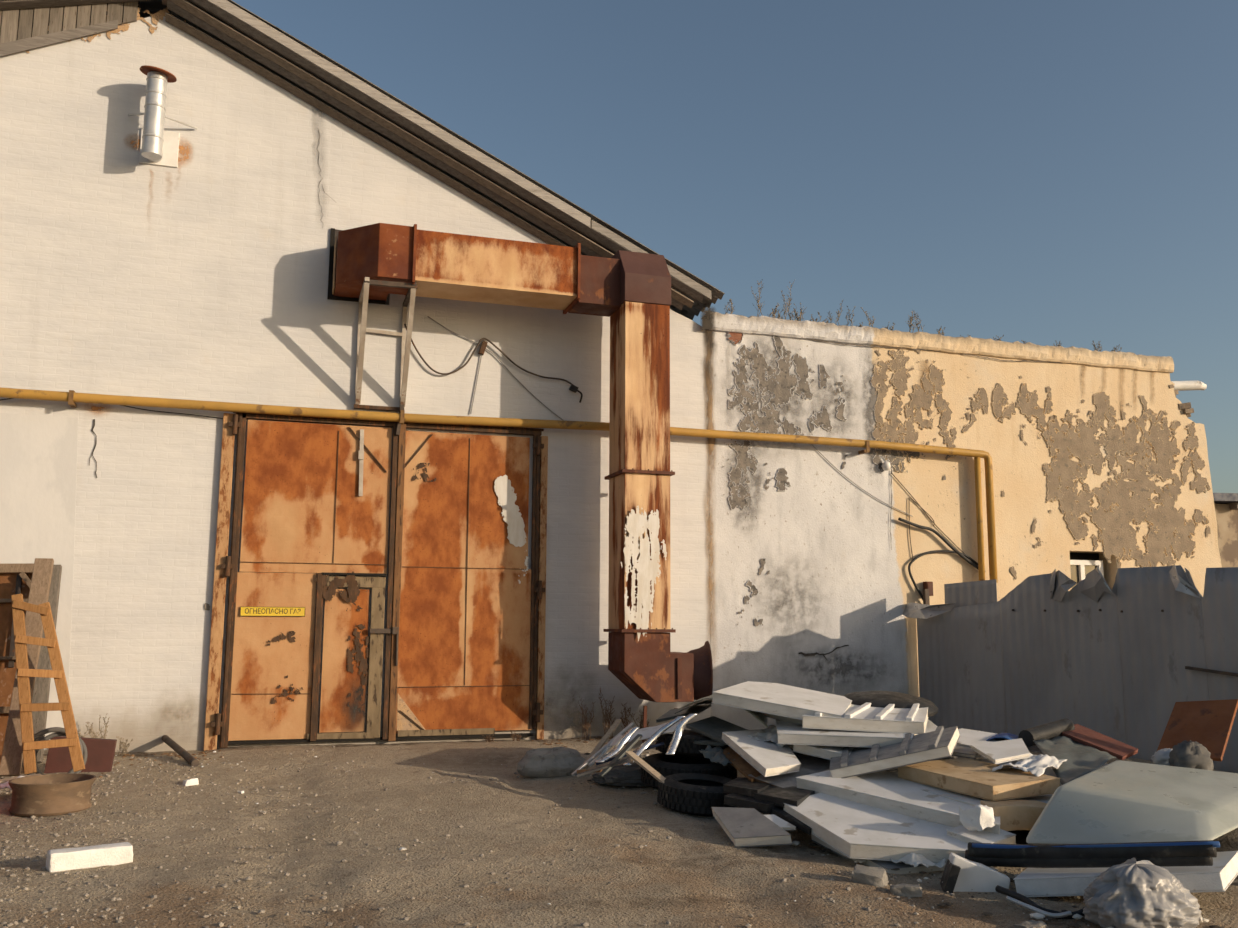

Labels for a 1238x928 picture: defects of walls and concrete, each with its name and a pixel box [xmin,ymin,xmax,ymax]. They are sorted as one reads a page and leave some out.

rust [178,145,190,162]
crack [89,419,97,478]
flaking render [722,332,847,510]
flaking render [870,349,1211,570]